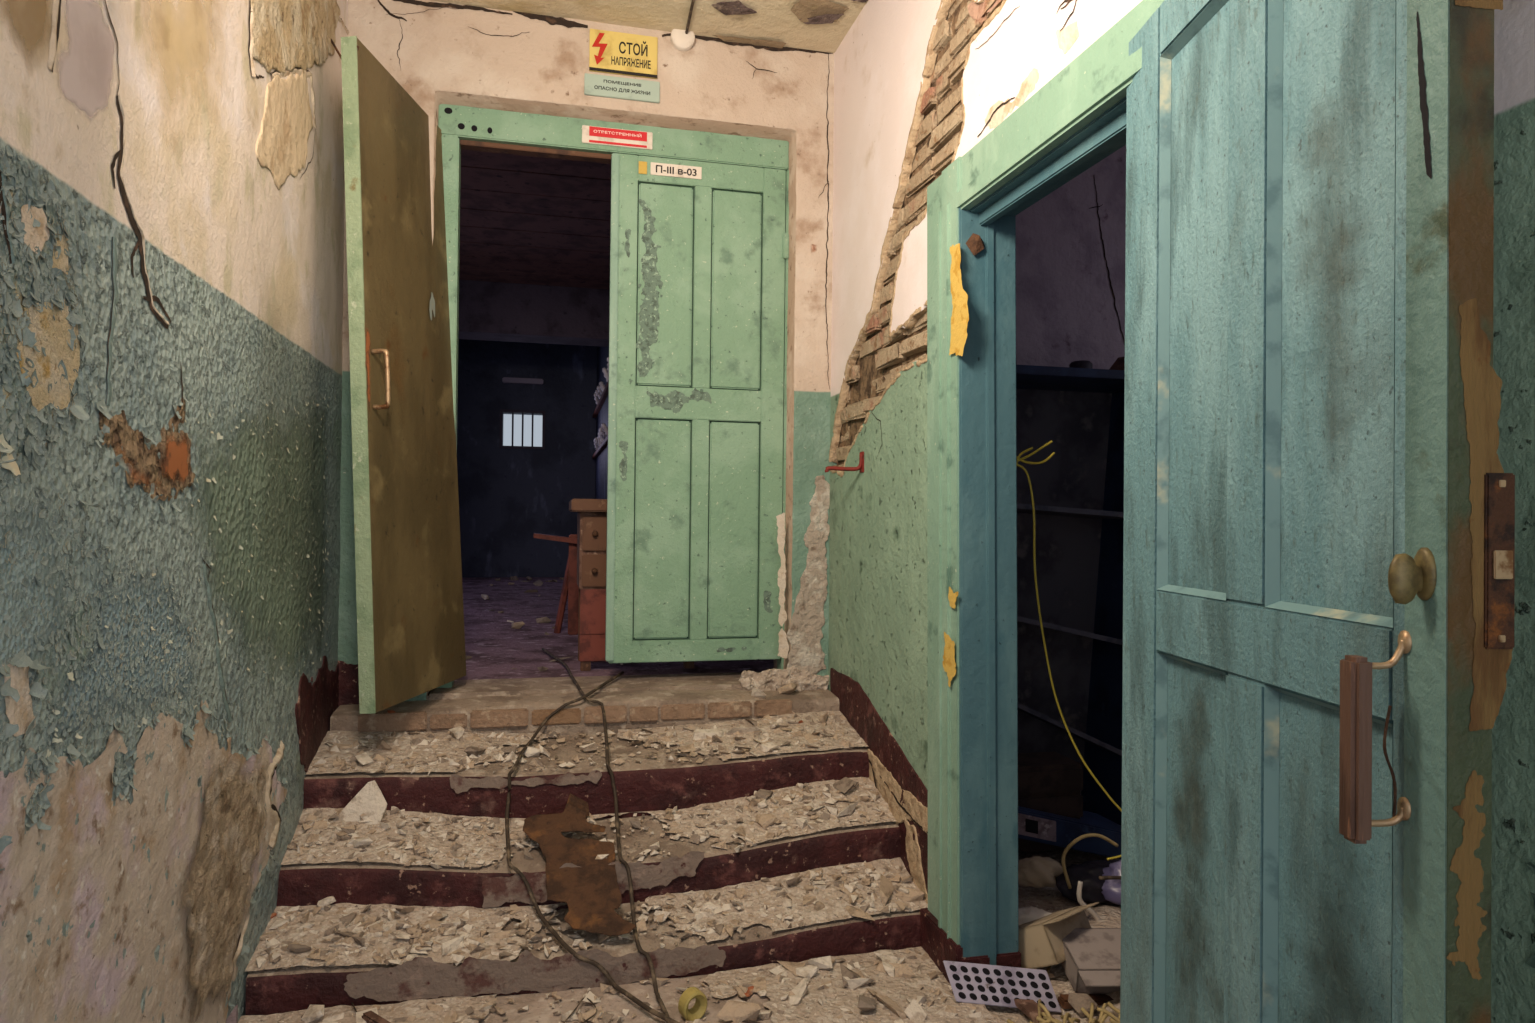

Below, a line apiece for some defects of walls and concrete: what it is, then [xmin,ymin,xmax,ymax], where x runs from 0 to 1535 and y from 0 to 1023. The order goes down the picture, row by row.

crack [48,0,61,72]
flaking render [712,0,757,15]
flaking render [713,35,786,48]
crack [1056,0,1076,31]
peeling [985,68,1039,129]
crack [105,0,183,406]
spalling [739,0,1007,691]
peeling [0,145,288,1023]